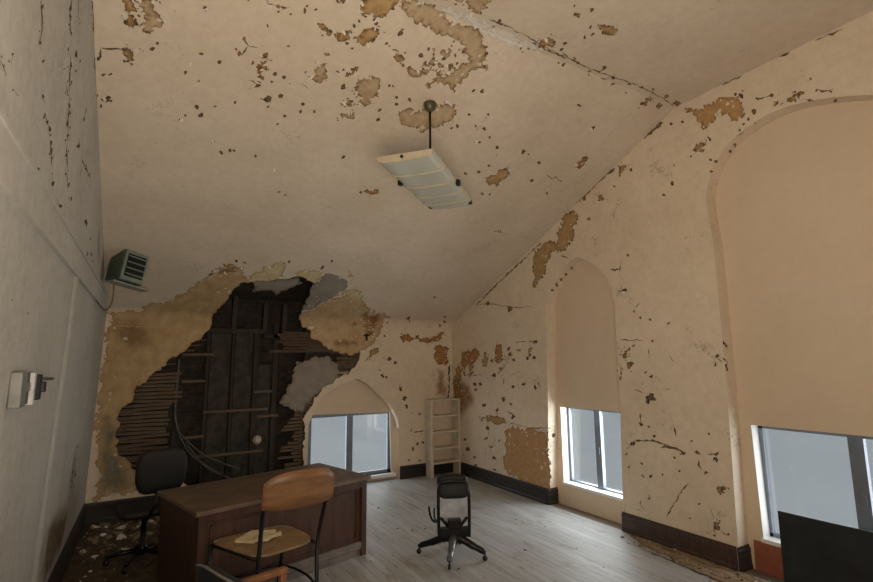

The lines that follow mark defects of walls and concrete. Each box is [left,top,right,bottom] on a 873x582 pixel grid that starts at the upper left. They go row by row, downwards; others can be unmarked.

crack [38,0,46,63]
peeling [94,0,167,76]
crack [491,20,674,136]
peeling [464,113,511,196]
crack [570,168,615,213]
peeling [638,77,837,172]
crack [477,243,541,305]
peeling [532,210,591,291]
peeling [91,260,397,503]
peeling [433,340,539,414]
peeling [481,397,556,491]